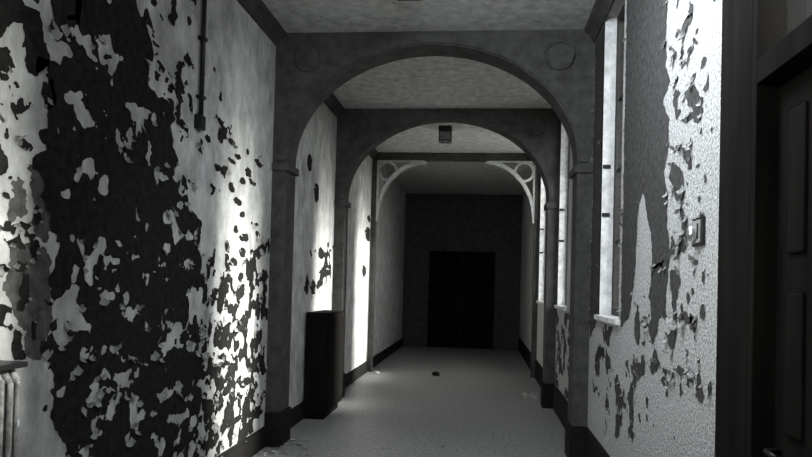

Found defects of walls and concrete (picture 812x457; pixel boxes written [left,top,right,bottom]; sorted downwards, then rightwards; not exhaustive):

peeling [301,243,334,298]
peeling [587,0,712,441]